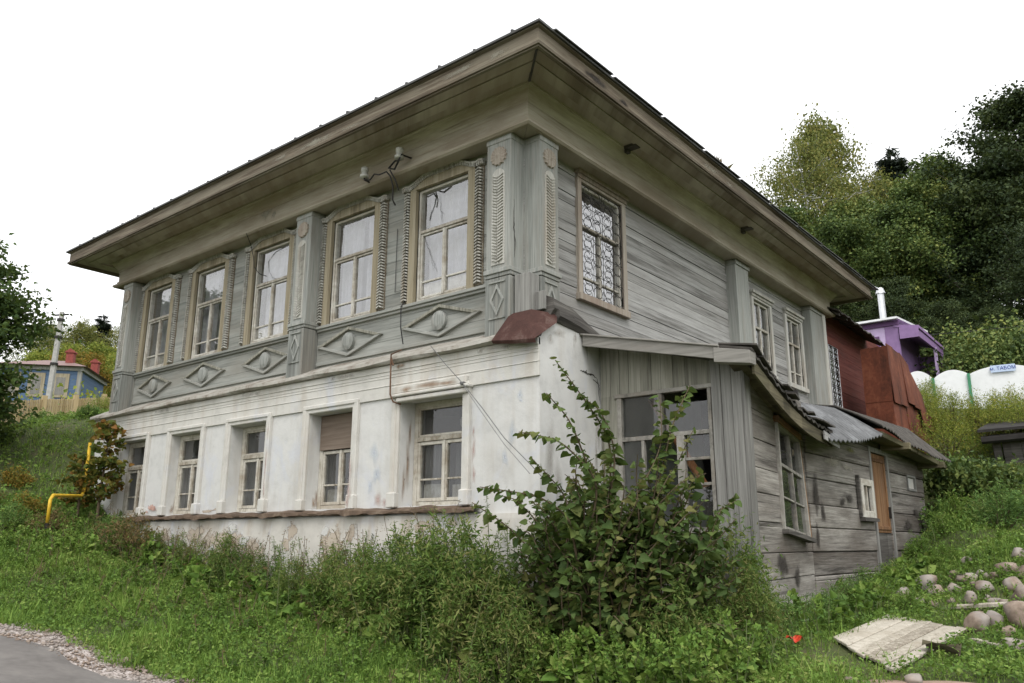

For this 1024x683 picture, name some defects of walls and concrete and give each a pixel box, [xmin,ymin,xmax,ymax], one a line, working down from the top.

peeling [317,524,355,568]
damp [814,476,826,546]